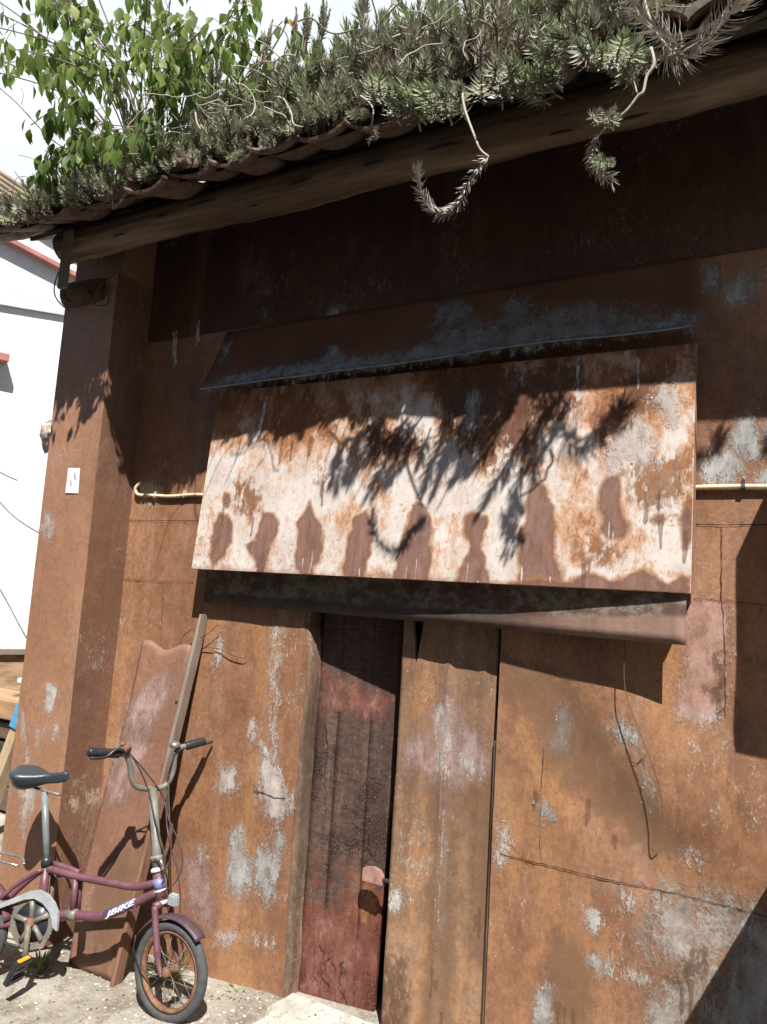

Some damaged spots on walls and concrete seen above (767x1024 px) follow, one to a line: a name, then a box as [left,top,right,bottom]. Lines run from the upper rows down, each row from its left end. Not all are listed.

peeling [200,288,710,397]
rust [209,476,279,572]
rust [254,404,339,454]
rust [294,467,327,574]
rust [342,510,375,577]
rust [356,417,429,469]
rust [393,502,433,580]
rust [427,357,694,593]
peeling [697,404,767,494]
peeling [180,626,296,955]
crack [500,842,767,917]
peeling [580,845,767,1024]